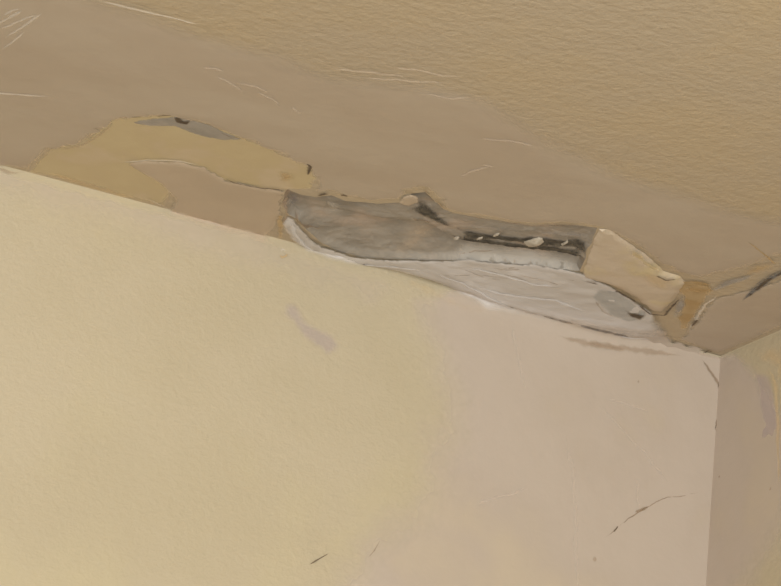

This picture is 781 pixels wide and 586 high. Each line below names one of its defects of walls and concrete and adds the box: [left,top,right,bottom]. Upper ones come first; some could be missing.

spalling [31,115,597,272]
spalling [595,291,645,321]
crack [609,493,694,535]